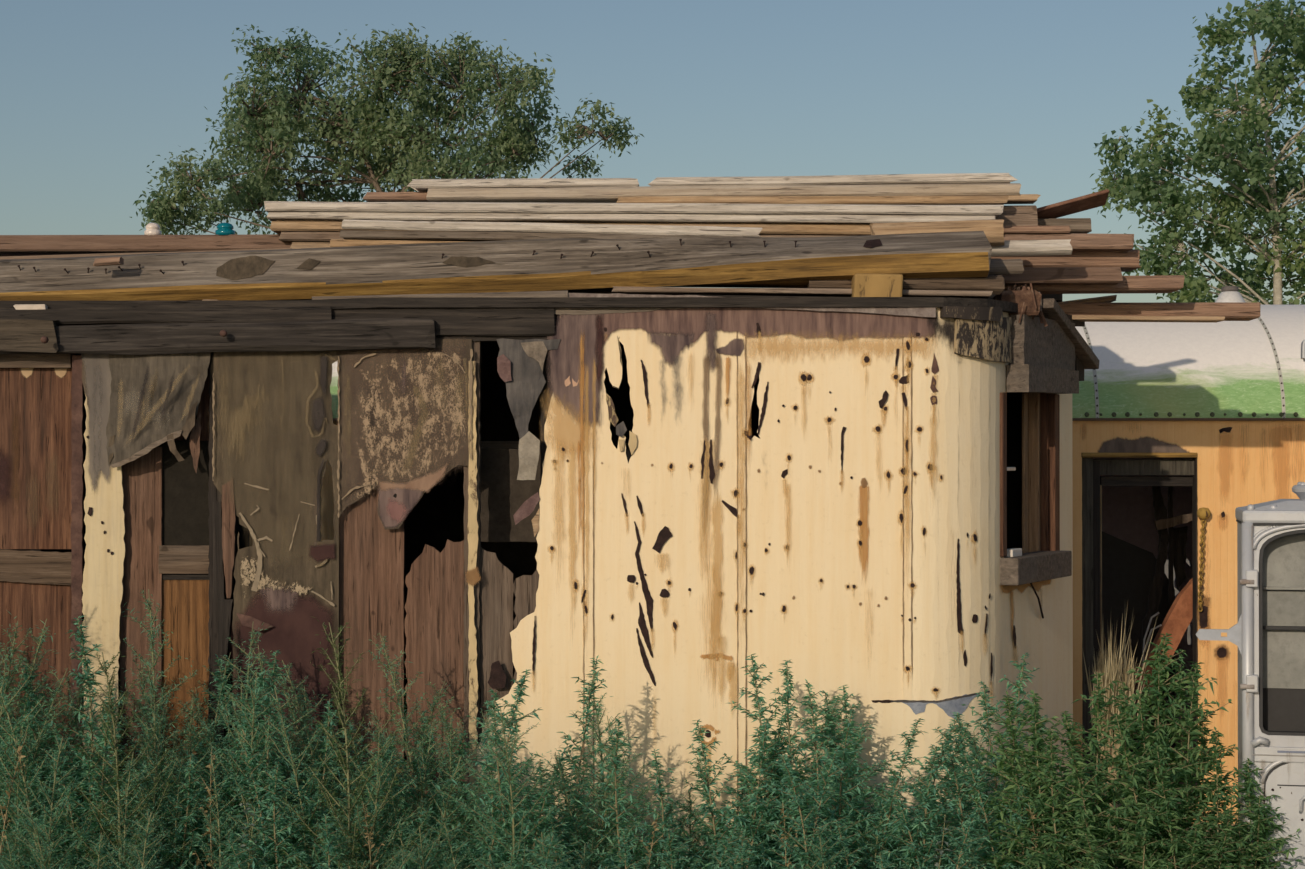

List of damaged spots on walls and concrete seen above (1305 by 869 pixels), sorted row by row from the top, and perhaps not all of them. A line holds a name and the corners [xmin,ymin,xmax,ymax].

peeling [82,354,112,489]
peeling [337,349,473,518]
rust [553,308,955,559]
rust [1098,437,1189,453]
crack [621,493,656,686]
rust [700,653,732,661]
rust [839,476,887,607]